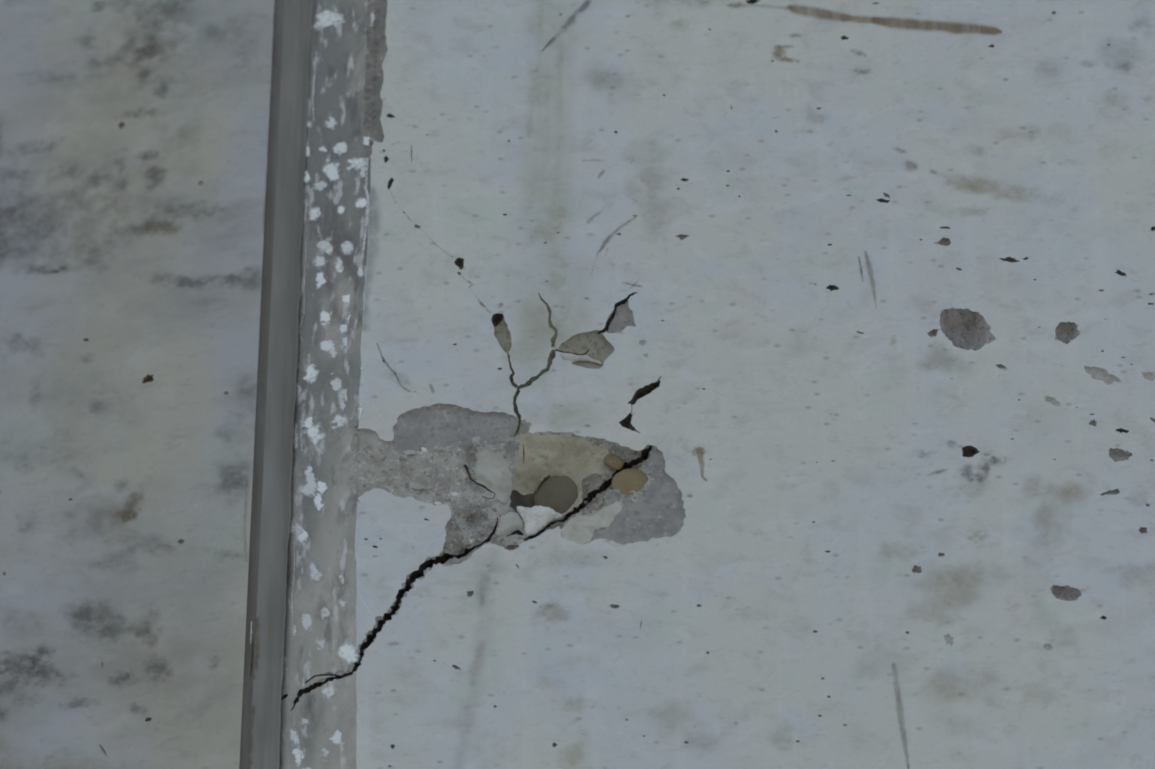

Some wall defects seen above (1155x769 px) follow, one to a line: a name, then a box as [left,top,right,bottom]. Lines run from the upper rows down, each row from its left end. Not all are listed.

corrosion [789,6,1001,34]
crack [491,292,638,463]
spalling [927,308,996,351]
crack [281,376,662,711]
spalling [339,383,686,566]